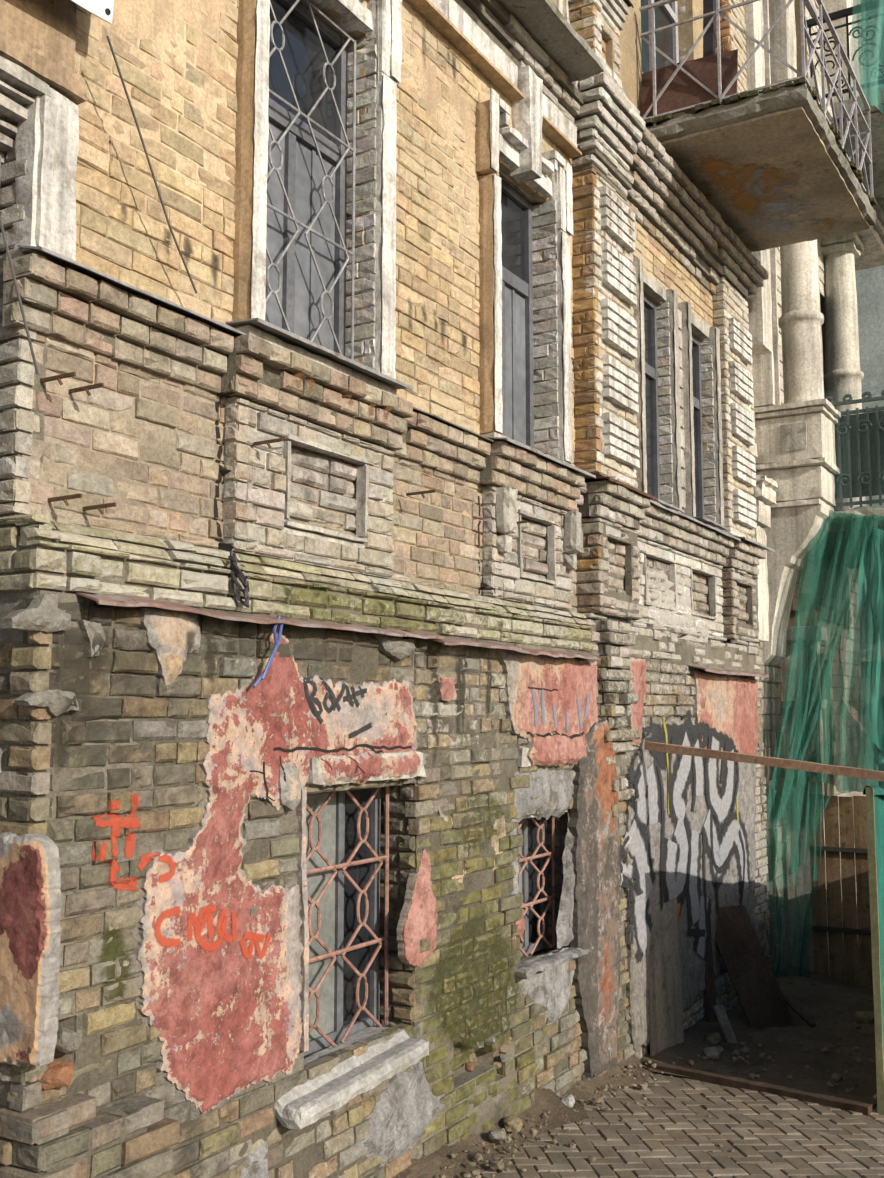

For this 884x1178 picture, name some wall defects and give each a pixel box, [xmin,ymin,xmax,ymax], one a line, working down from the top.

flaking render [496,647,598,767]
flaking render [625,657,646,746]
flaking render [0,832,83,1090]
flaking render [132,608,421,1120]
flaking render [397,849,438,968]